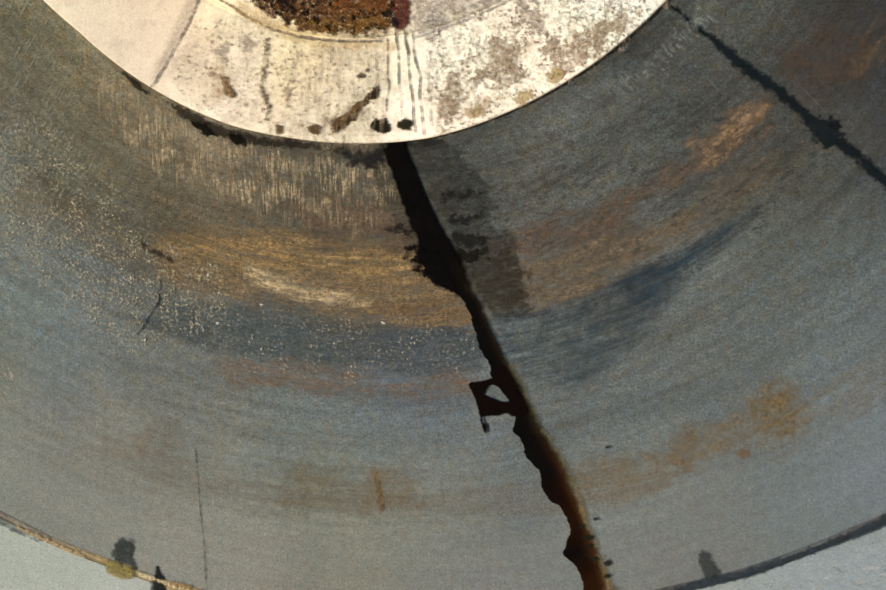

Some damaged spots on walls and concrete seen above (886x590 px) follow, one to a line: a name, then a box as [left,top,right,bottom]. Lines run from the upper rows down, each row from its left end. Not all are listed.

rust [563,103,768,238]